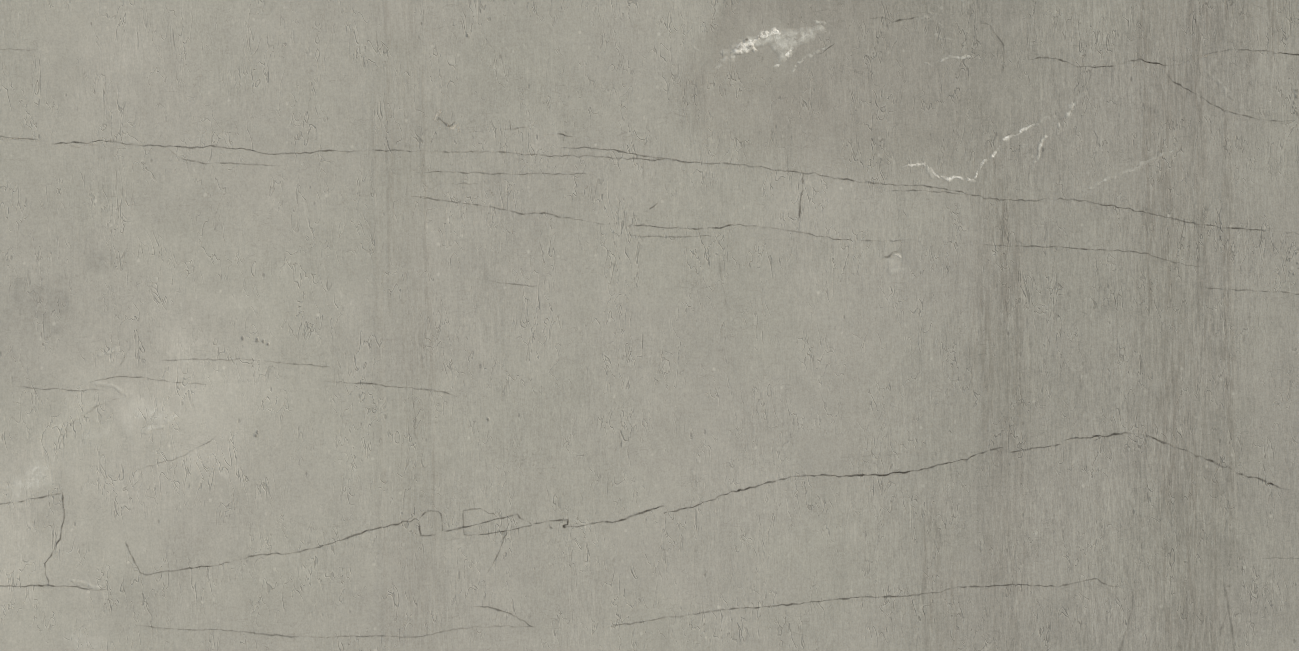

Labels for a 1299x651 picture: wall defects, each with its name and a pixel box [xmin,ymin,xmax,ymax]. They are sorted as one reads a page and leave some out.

crack [838,470,910,478]
water stain [668,0,1299,651]